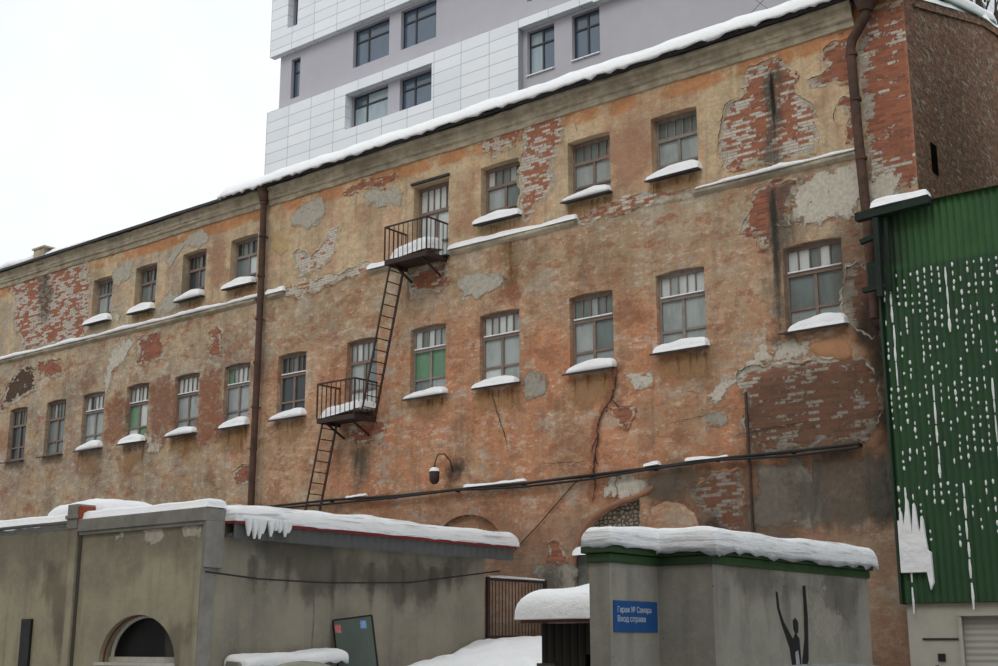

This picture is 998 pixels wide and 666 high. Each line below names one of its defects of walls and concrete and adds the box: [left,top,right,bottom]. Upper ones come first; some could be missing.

spalling [479,116,565,226]
spalling [571,182,697,228]
spalling [716,0,917,253]
spalling [1,262,92,410]
spalling [103,328,166,396]
crack [543,366,622,503]
spalling [605,402,638,432]
spalling [687,331,885,530]